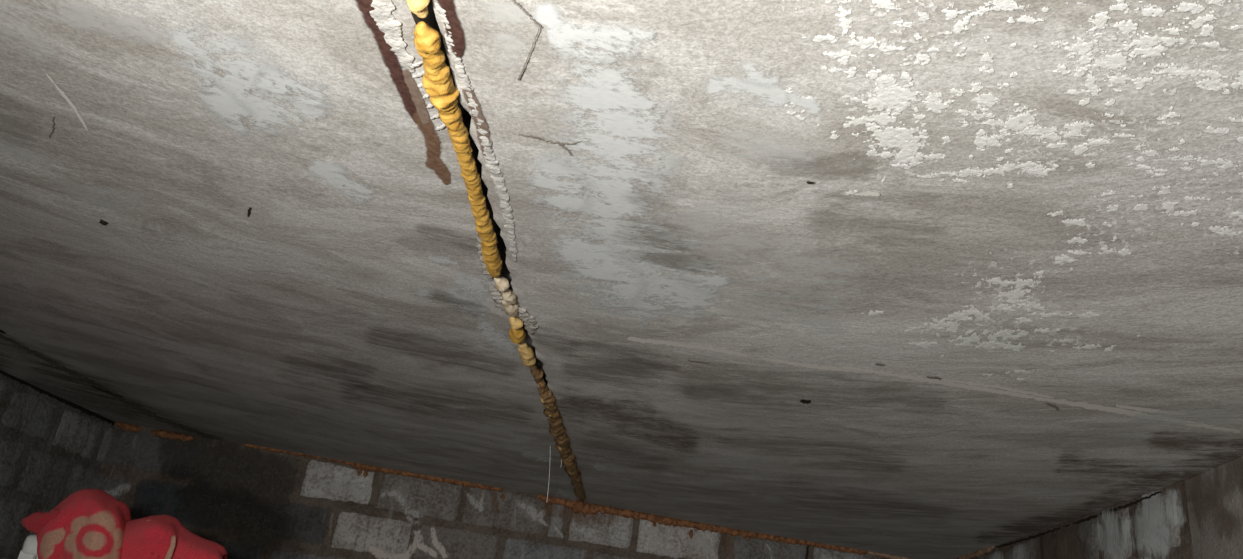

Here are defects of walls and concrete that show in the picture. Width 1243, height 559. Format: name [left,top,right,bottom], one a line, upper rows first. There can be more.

corrosion [437,0,465,57]
crack [512,0,541,80]
corrosion [355,0,450,185]
crack [519,134,582,156]